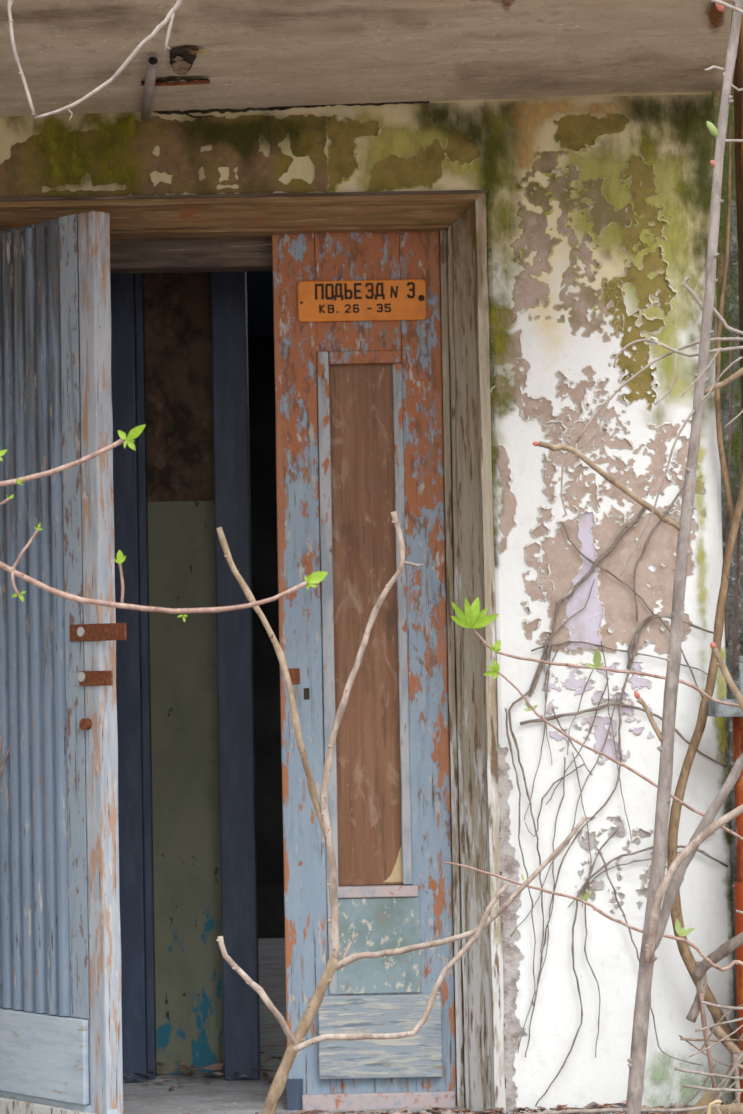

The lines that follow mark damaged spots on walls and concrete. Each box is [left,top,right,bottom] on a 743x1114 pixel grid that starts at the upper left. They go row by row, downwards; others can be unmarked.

peeling [0,114,482,198]
damp [482,143,503,196]
peeling [489,113,707,765]